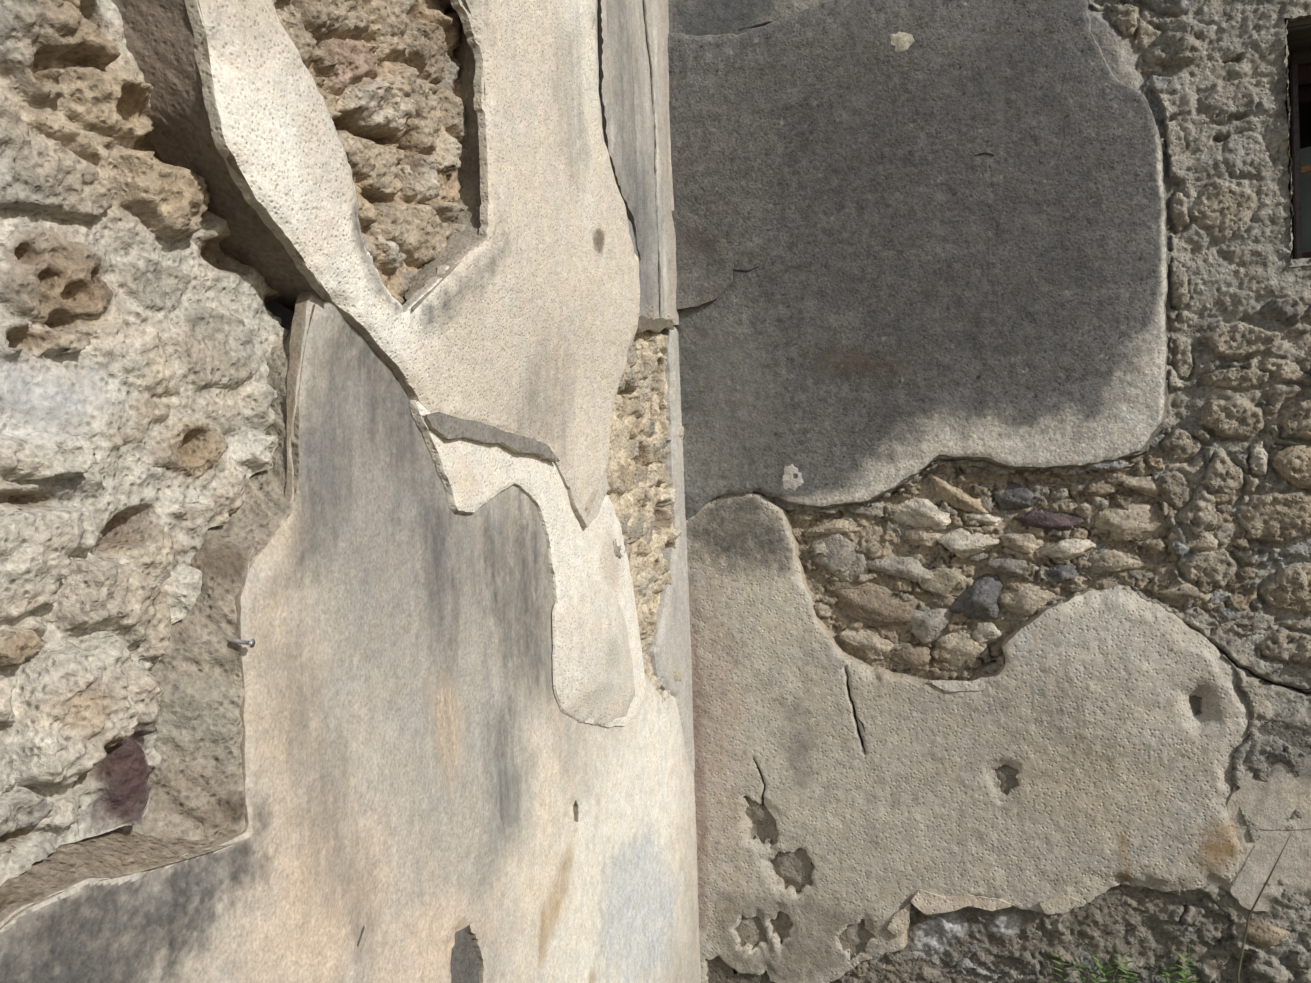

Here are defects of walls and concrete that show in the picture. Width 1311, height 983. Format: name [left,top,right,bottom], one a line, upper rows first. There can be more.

spalling [274,0,487,310]
spalling [0,0,331,886]
damp [485,528,541,682]
spalling [786,446,1259,692]
crack [845,668,865,751]
crack [1212,643,1311,694]
crack [753,758,765,807]
spalling [995,765,1019,794]
spalling [743,796,815,893]
spalling [450,927,484,983]
spalling [734,912,793,949]
spalling [829,879,1254,983]